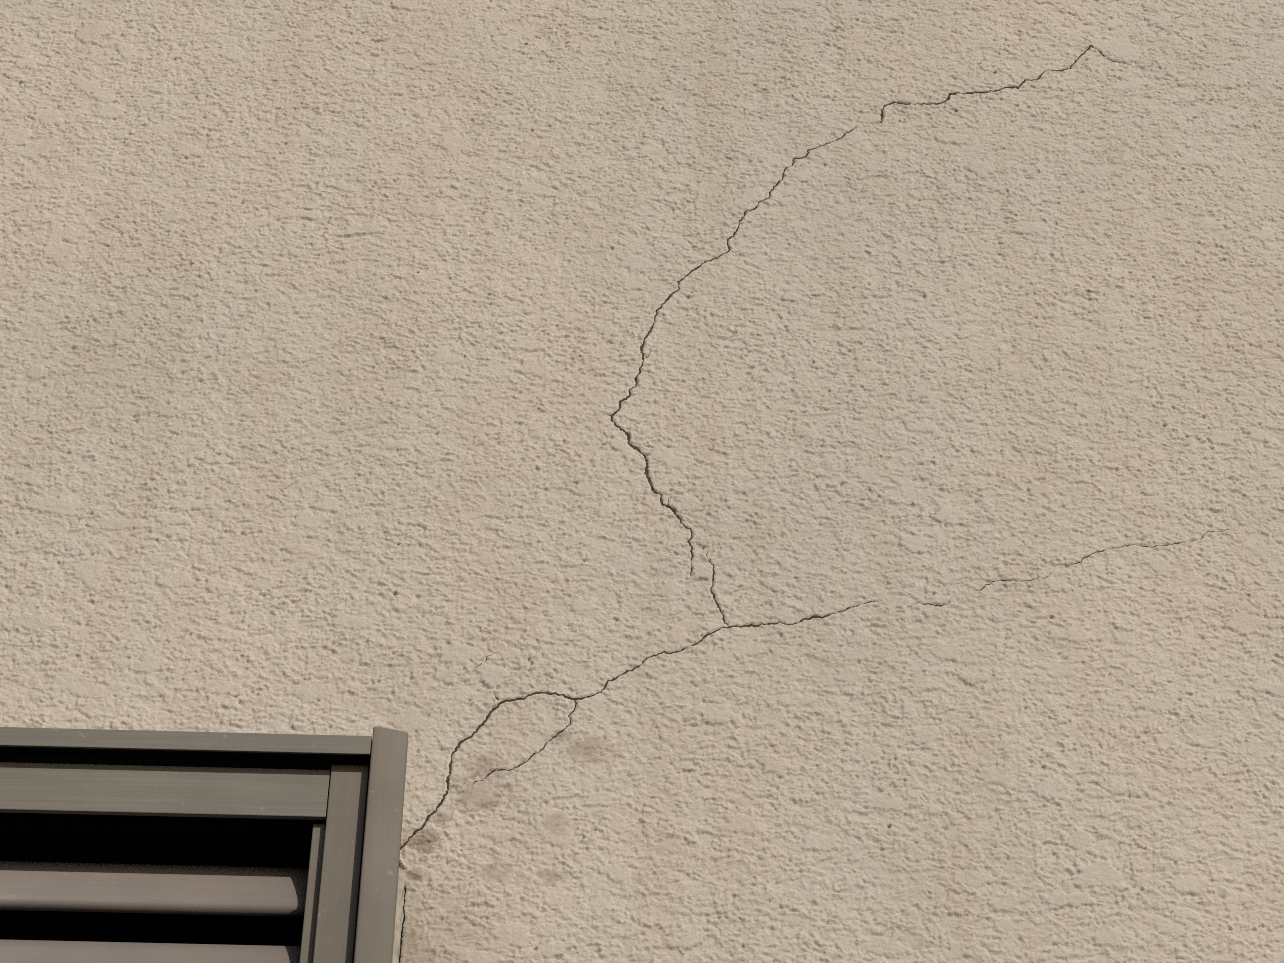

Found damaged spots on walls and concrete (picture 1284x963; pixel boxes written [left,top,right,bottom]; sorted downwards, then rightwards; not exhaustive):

crack [400,45,1129,850]
crack [976,529,1229,591]
crack [398,886,406,963]